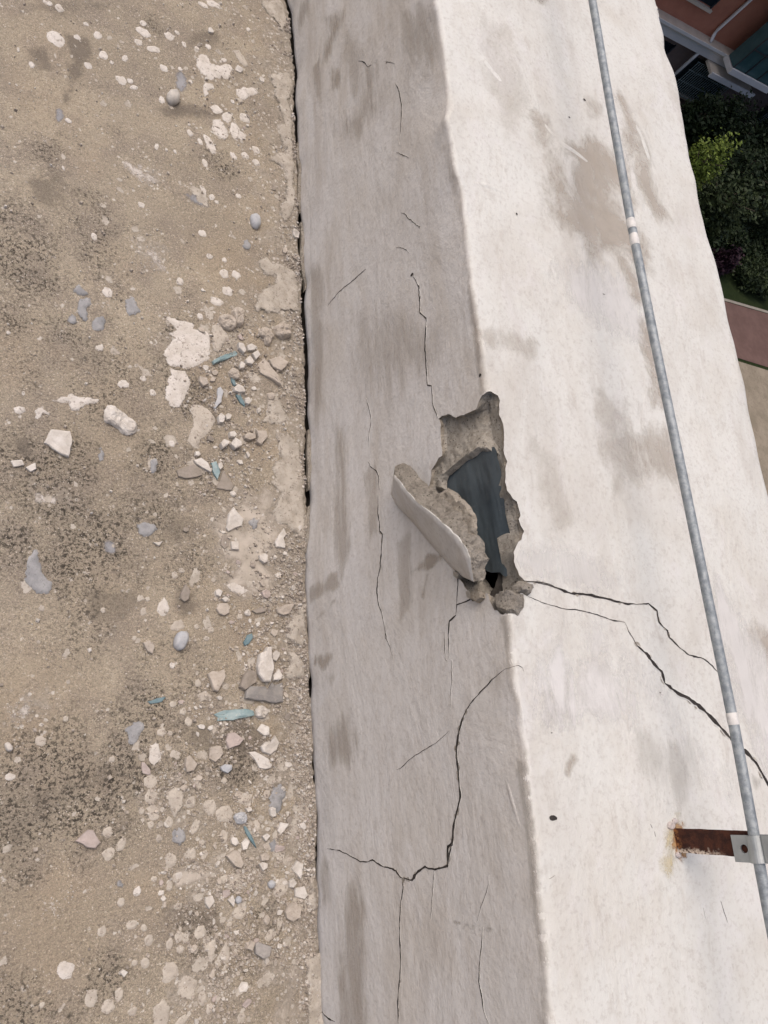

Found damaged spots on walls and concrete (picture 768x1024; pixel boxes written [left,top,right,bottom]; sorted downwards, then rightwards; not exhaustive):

crack [362,61,409,158]
crack [412,275,438,417]
crack [368,462,393,657]
spalling [429,391,524,614]
crack [523,580,768,788]
crack [327,579,524,1024]
rust [664,823,687,874]